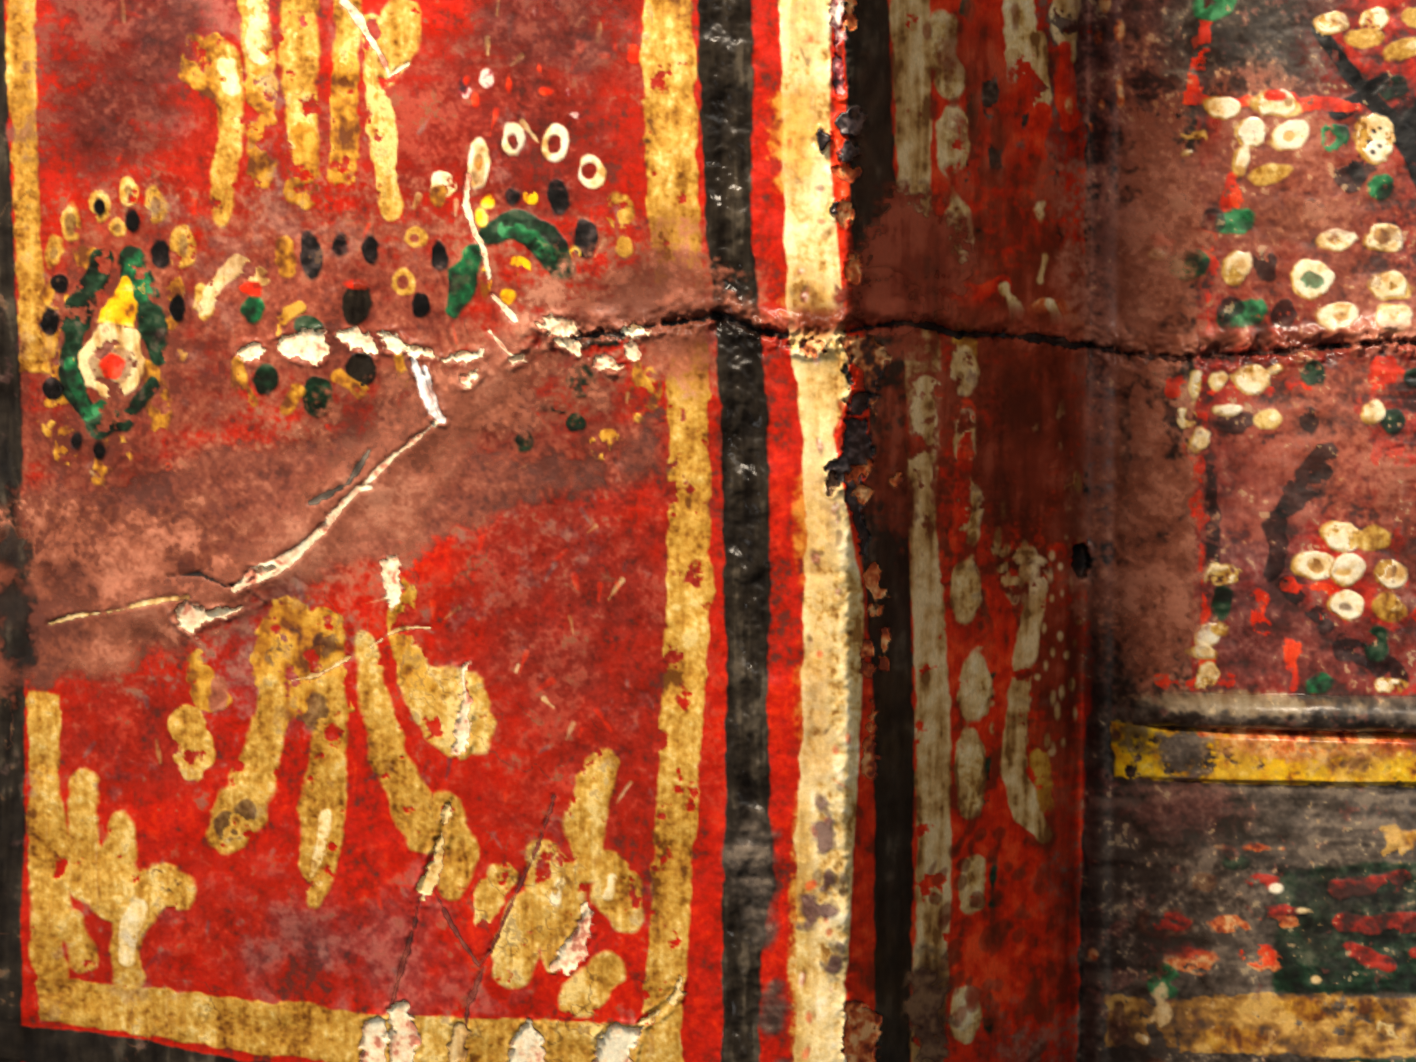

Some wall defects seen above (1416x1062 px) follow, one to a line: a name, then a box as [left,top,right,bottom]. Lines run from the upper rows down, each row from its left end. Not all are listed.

crack [340,0,409,77]
peeling [816,0,868,183]
peeling [237,326,484,388]
crack [574,312,788,341]
crack [843,320,1416,362]
water stain [0,252,735,701]
peeling [379,555,404,608]
peeling [176,600,242,633]
peeling [452,663,473,755]
peeling [359,1001,421,1062]
peeling [508,1018,546,1062]
peeling [593,975,685,1062]